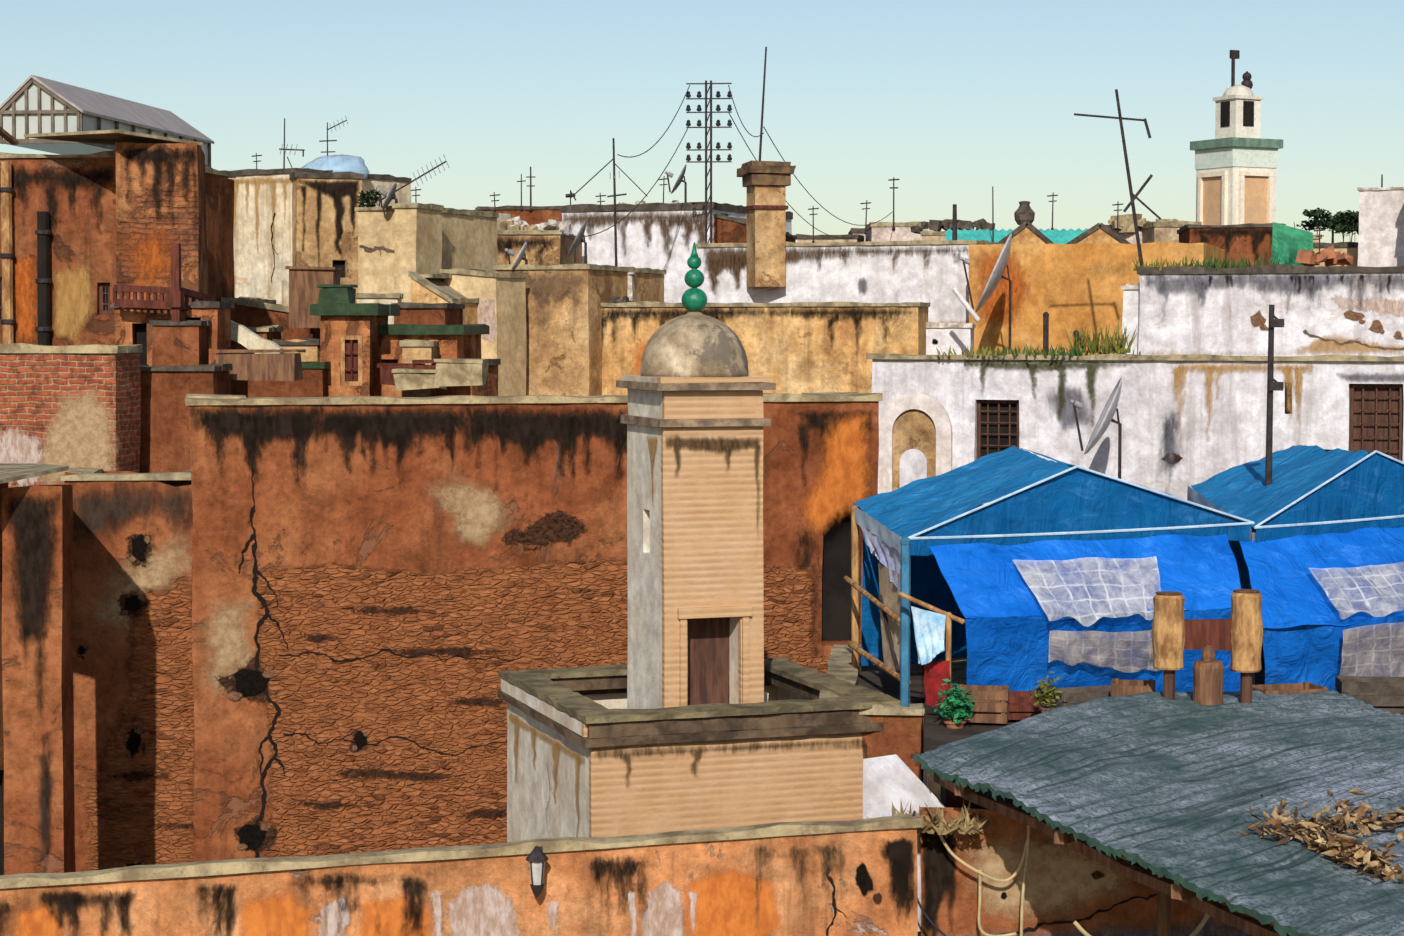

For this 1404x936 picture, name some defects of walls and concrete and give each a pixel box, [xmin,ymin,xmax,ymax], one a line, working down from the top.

leakage [232,178,358,261]
leakage [564,213,905,343]
spalling [1250,310,1268,330]
peeling [1332,295,1404,339]
leakage [193,406,627,477]
leakage [1164,337,1401,475]
leakage [8,496,58,707]
spalling [84,535,194,871]
crack [238,462,522,858]
spalling [210,510,628,857]
spalling [763,564,829,675]
crack [825,852,847,936]